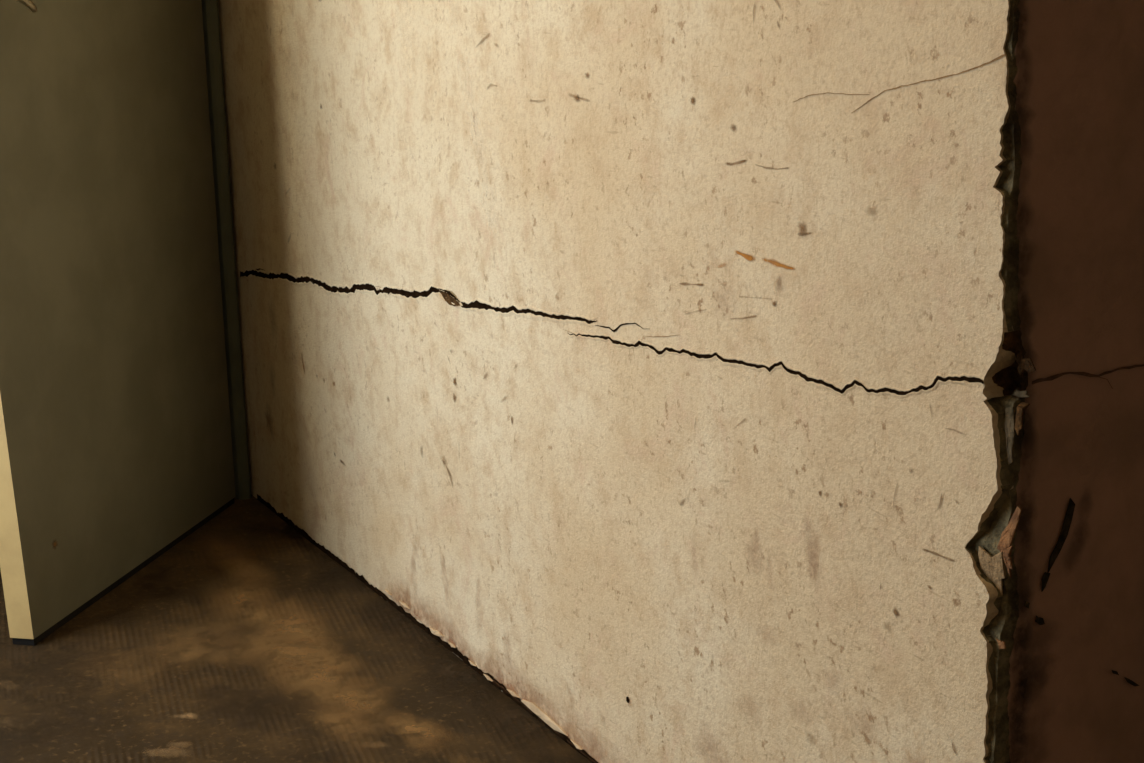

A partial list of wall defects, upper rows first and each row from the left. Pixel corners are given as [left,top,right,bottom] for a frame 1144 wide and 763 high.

crack [240,268,985,399]
flaking render [966,0,1045,763]
crack [1032,364,1144,389]